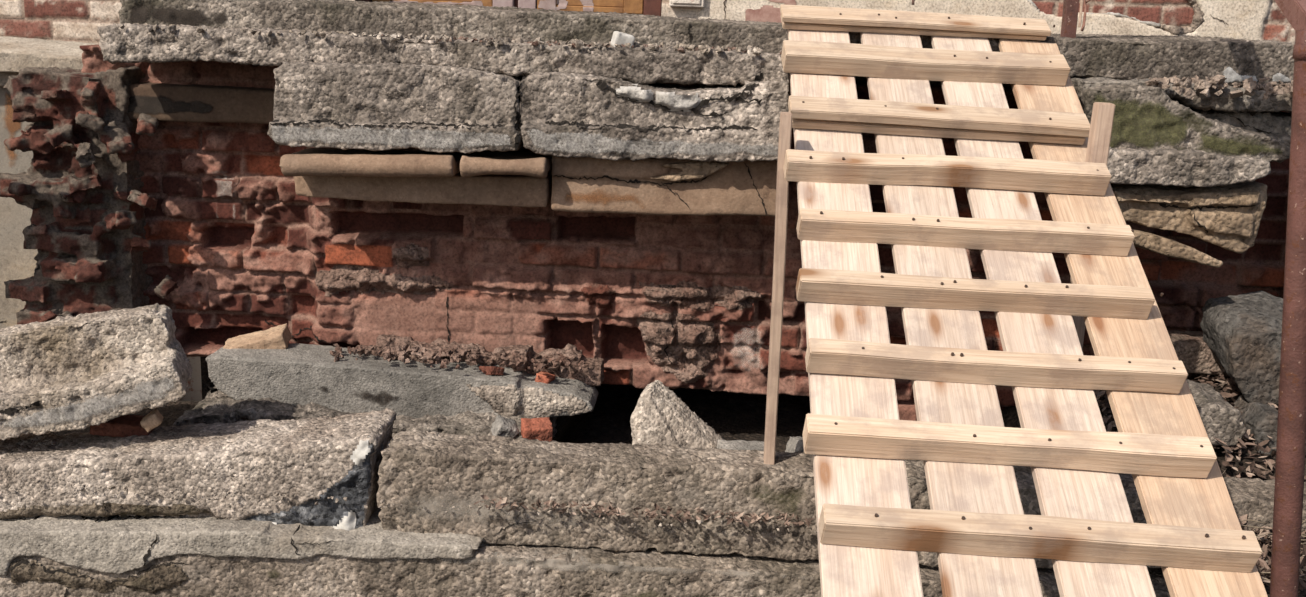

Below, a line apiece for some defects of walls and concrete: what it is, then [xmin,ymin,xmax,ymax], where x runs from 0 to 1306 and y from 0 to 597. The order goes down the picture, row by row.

peeling [538,0,594,12]
flaking render [1028,0,1205,35]
crack [270,73,763,150]
crack [554,175,711,209]
crack [745,164,767,214]
crack [81,515,165,566]